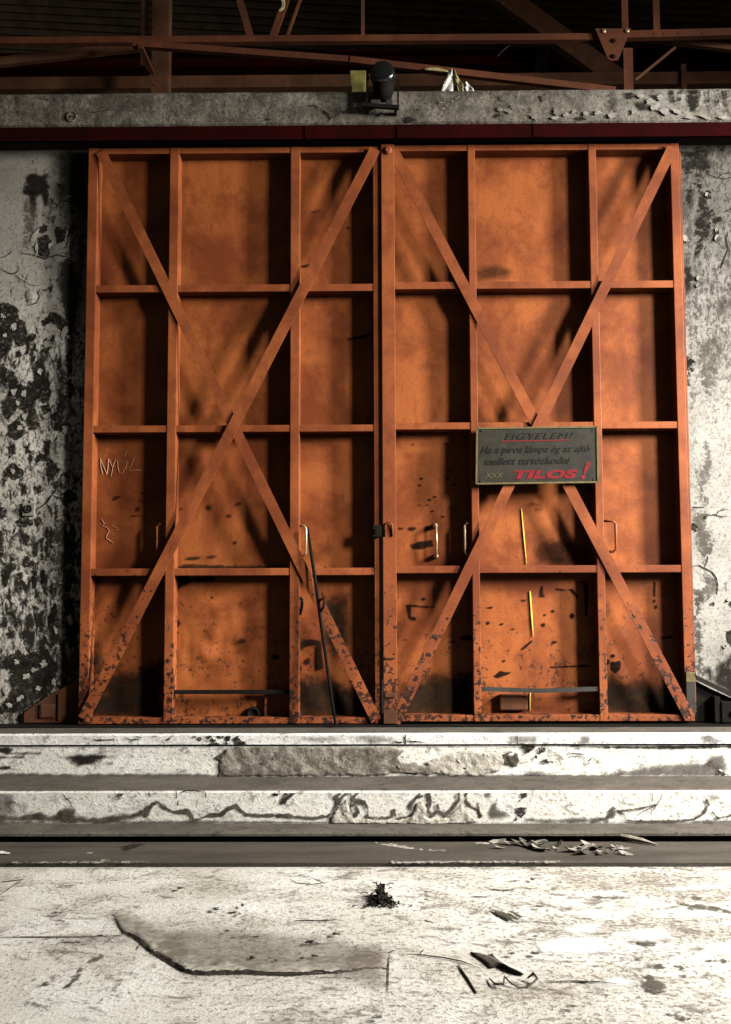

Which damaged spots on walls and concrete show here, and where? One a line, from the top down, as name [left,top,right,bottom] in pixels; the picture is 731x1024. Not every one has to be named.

peeling [530,94,617,121]
peeling [626,92,728,120]
spalling [31,225,66,258]
peeling [0,302,73,498]
corrosion [177,555,286,590]
peeling [0,490,77,714]
corrosion [407,598,434,621]
corrosion [556,581,588,619]
corrosion [300,639,323,671]
spalling [192,736,553,777]
crack [7,904,394,995]